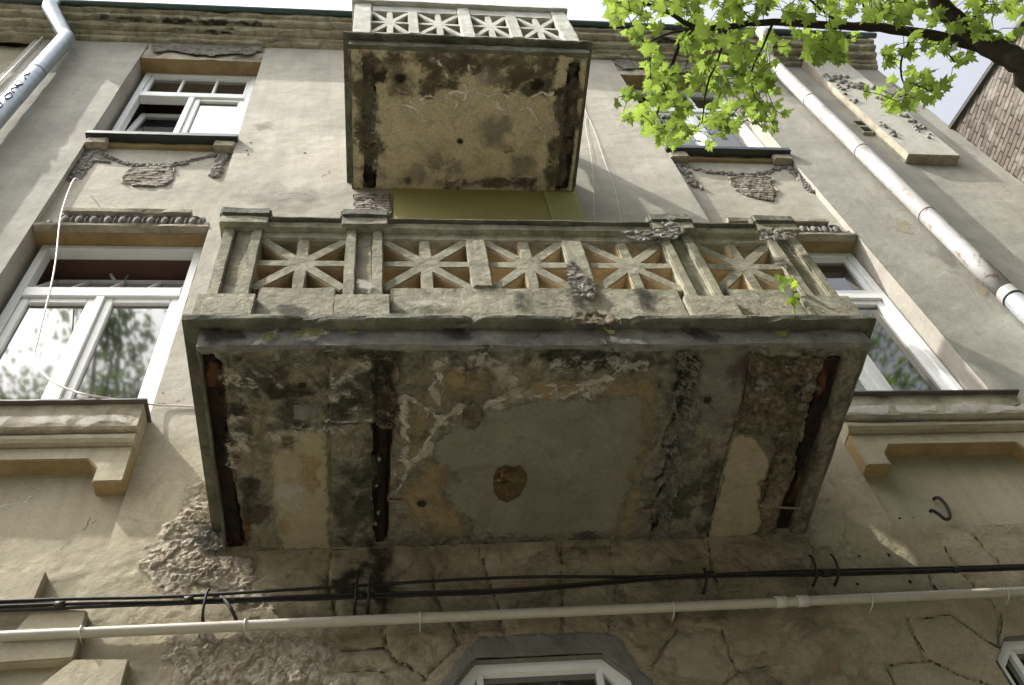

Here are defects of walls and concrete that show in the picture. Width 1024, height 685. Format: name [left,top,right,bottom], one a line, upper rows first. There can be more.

water stain [351,43,583,191]
water stain [442,342,666,398]
flaking render [137,476,278,612]
water stain [223,347,402,547]
corrosion [493,465,527,503]
water stain [668,463,719,532]
flaking render [709,352,824,538]